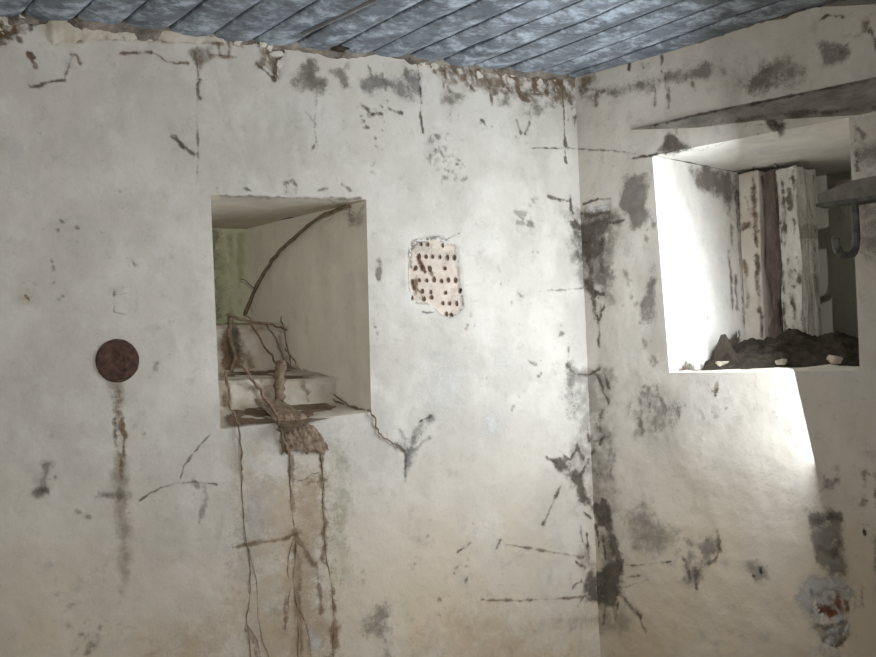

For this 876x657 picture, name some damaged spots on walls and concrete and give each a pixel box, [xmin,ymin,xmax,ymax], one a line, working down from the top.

flaking render [0,15,37,68]
leakage [292,59,327,90]
leakage [361,62,620,114]
leakage [636,55,711,90]
spalling [408,236,464,317]
leakage [547,176,656,346]
leakage [584,367,610,404]
corrosion [114,418,127,478]
leakage [546,433,645,629]
leakage [684,539,721,589]
leakage [808,513,846,576]
spalling [796,575,852,649]